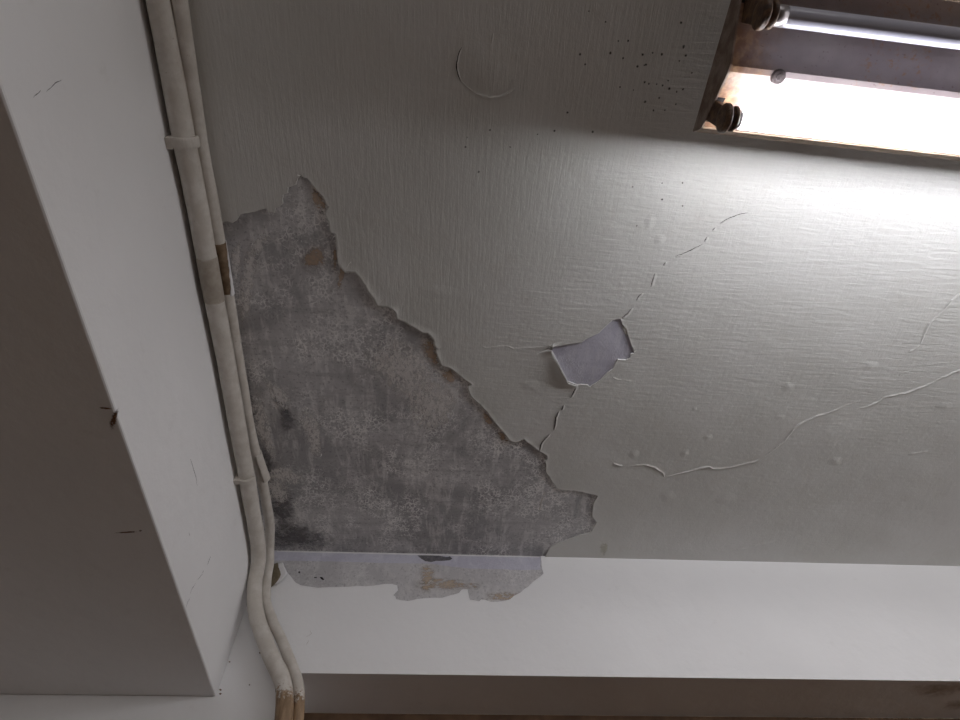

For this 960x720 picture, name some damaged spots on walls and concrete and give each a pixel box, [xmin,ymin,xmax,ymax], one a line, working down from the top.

crack [622,212,748,319]
peeling [222,173,600,604]
crack [539,387,578,451]
peeling [536,317,638,396]
crack [613,368,960,479]